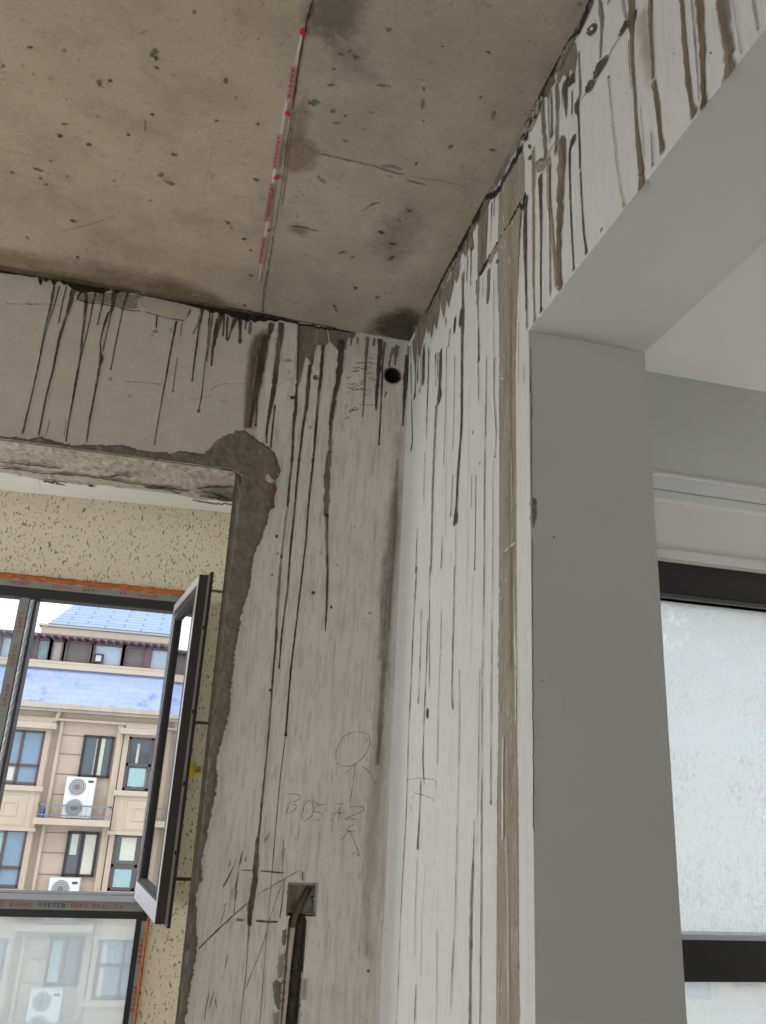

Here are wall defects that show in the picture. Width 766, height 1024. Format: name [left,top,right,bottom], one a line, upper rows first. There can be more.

crack [0,0,351,332]
damp [518,43,587,352]
damp [598,0,609,59]
damp [625,0,664,191]
damp [679,0,735,120]
damp [0,253,284,448]
damp [240,199,496,1024]